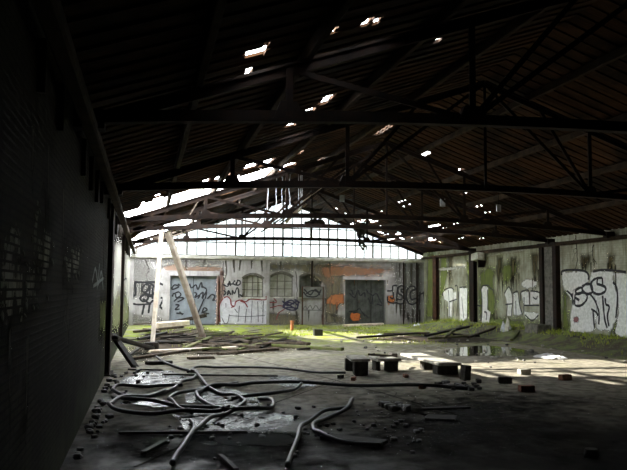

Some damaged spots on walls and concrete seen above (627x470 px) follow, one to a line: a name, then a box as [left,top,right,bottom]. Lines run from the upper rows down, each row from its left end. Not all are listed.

water stain [479,257,539,326]
water stain [580,254,592,270]